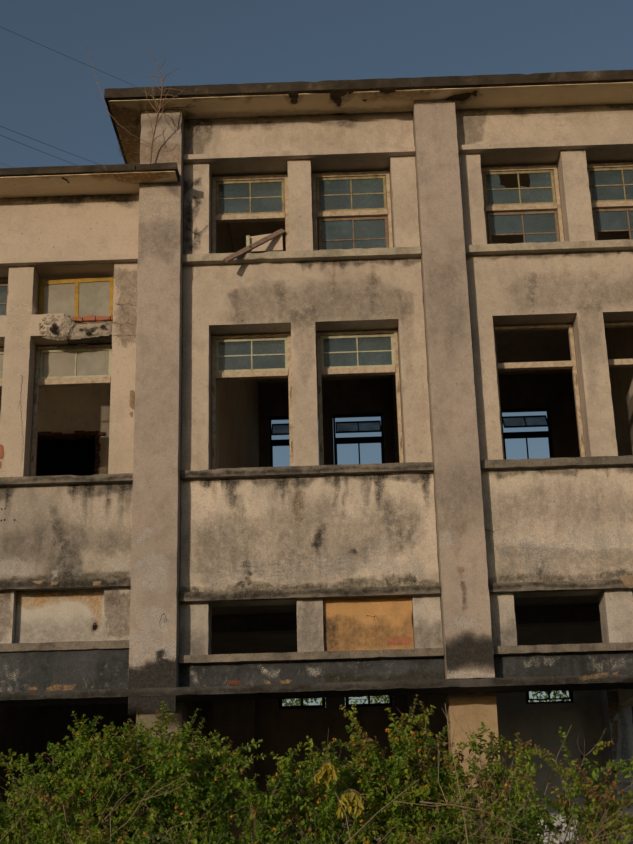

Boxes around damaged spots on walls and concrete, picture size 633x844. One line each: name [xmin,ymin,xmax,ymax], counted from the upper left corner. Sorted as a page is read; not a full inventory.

spalling [288,91,299,104]
spalling [330,89,357,107]
spalling [445,90,477,101]
mould [183,180,200,253]
spalling [38,313,113,340]
leakage [445,618,510,684]